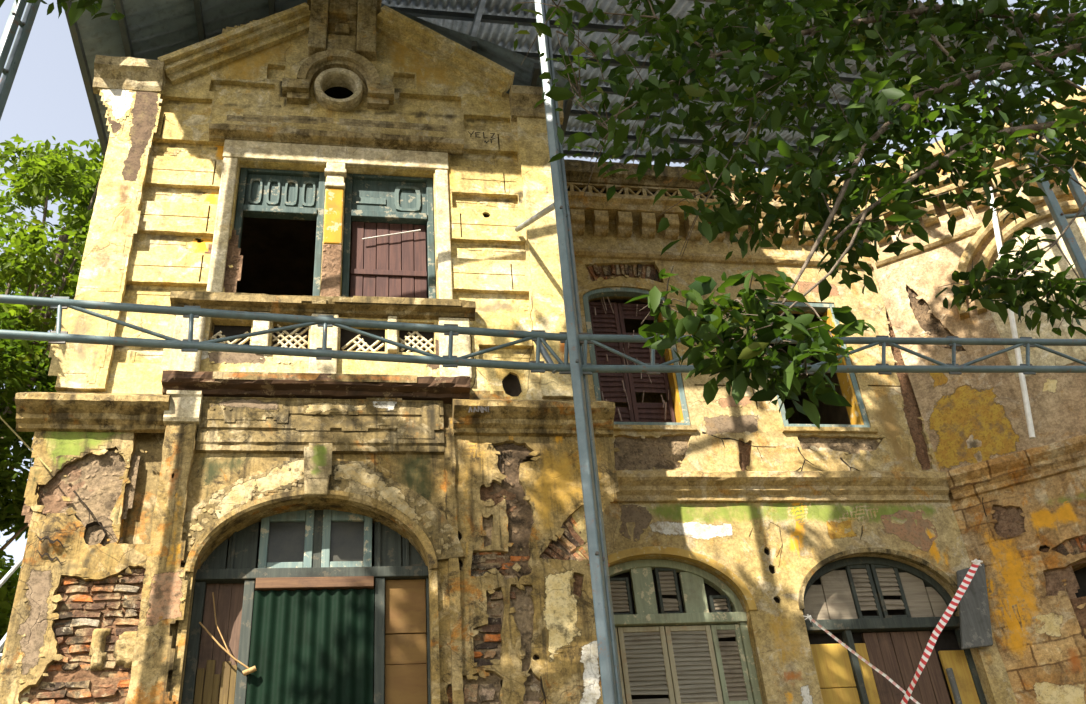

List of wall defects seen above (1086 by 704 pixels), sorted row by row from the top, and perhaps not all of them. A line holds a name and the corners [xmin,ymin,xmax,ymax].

spalling [98,78,166,182]
spalling [906,287,965,351]
peeling [702,394,761,471]
peeling [885,307,1025,471]
spalling [21,449,148,546]
spalling [12,566,188,704]
peeling [443,436,603,704]
spalling [595,434,737,567]
spalling [990,505,1026,538]
spalling [1032,535,1086,642]